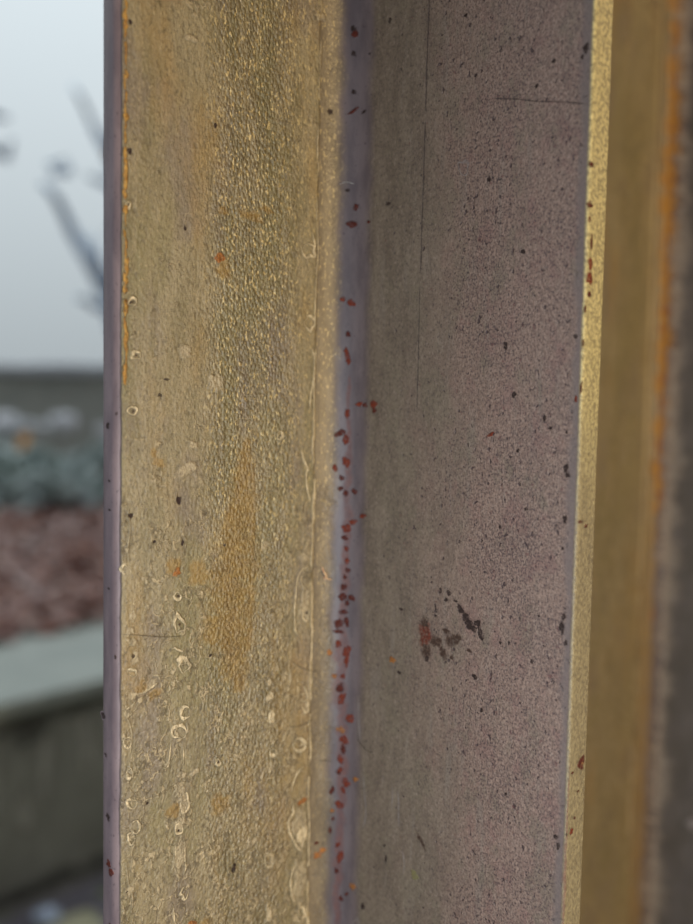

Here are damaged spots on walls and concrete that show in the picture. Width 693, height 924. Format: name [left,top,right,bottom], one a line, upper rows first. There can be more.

corrosion [121,0,130,387]
corrosion [313,330,379,924]